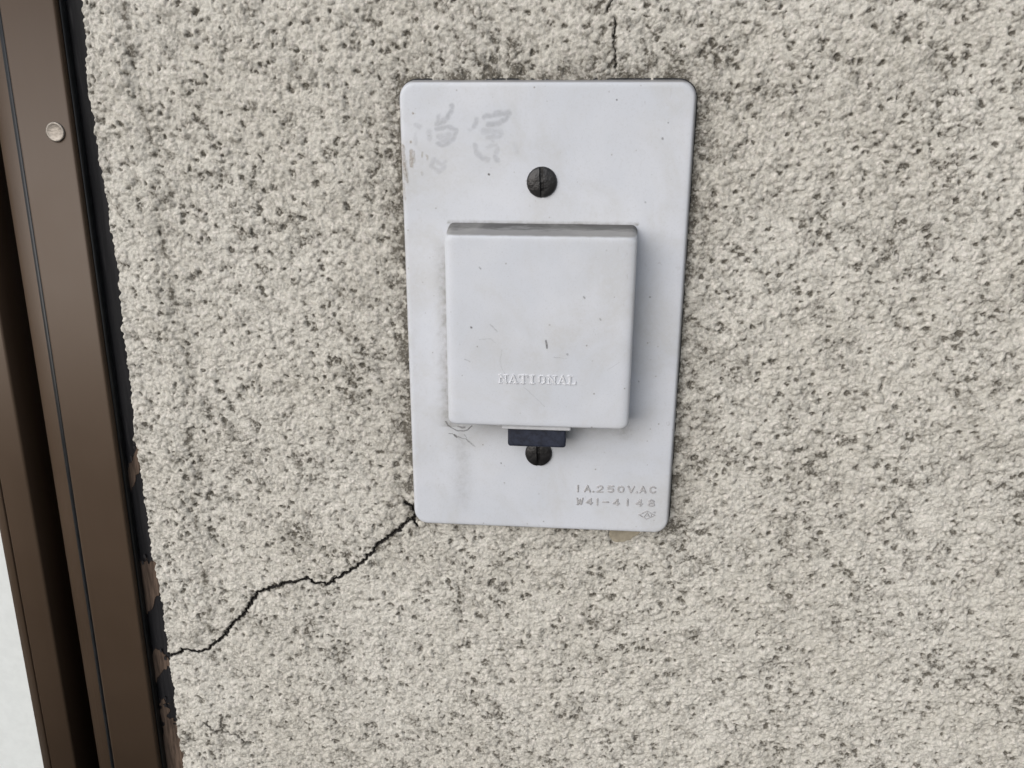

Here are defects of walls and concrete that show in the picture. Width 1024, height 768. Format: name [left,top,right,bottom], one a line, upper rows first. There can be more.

crack [168,502,418,656]